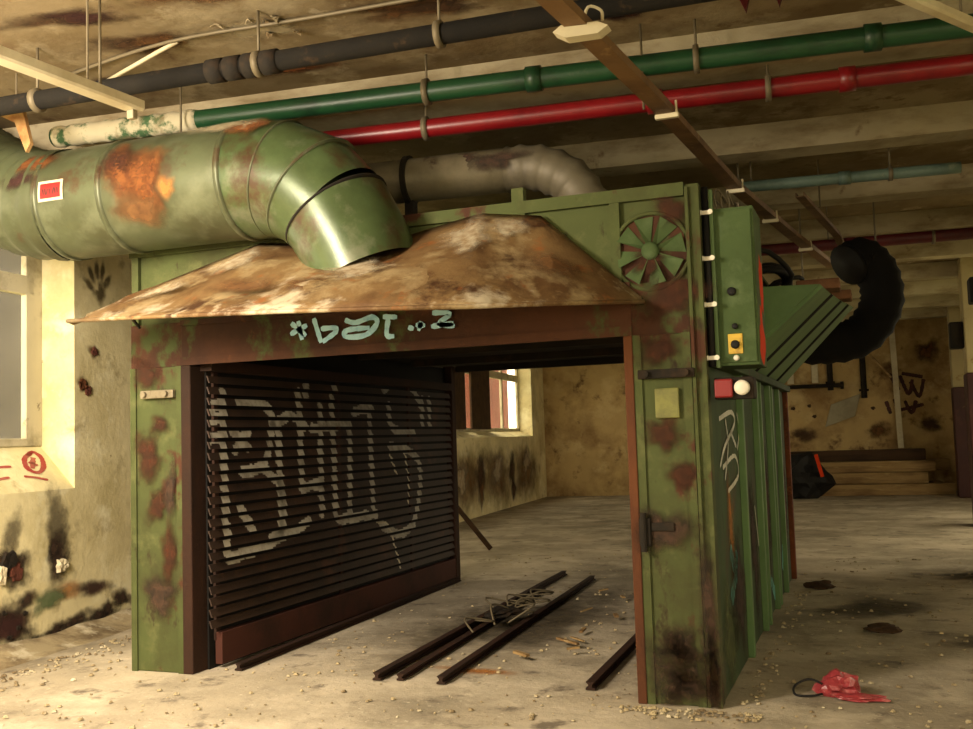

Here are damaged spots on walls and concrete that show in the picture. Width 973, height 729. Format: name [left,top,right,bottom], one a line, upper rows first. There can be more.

water stain [793,430,815,442]
water stain [869,422,890,438]
water stain [457,448,536,507]
spalling [0,521,29,589]
spalling [48,498,69,581]